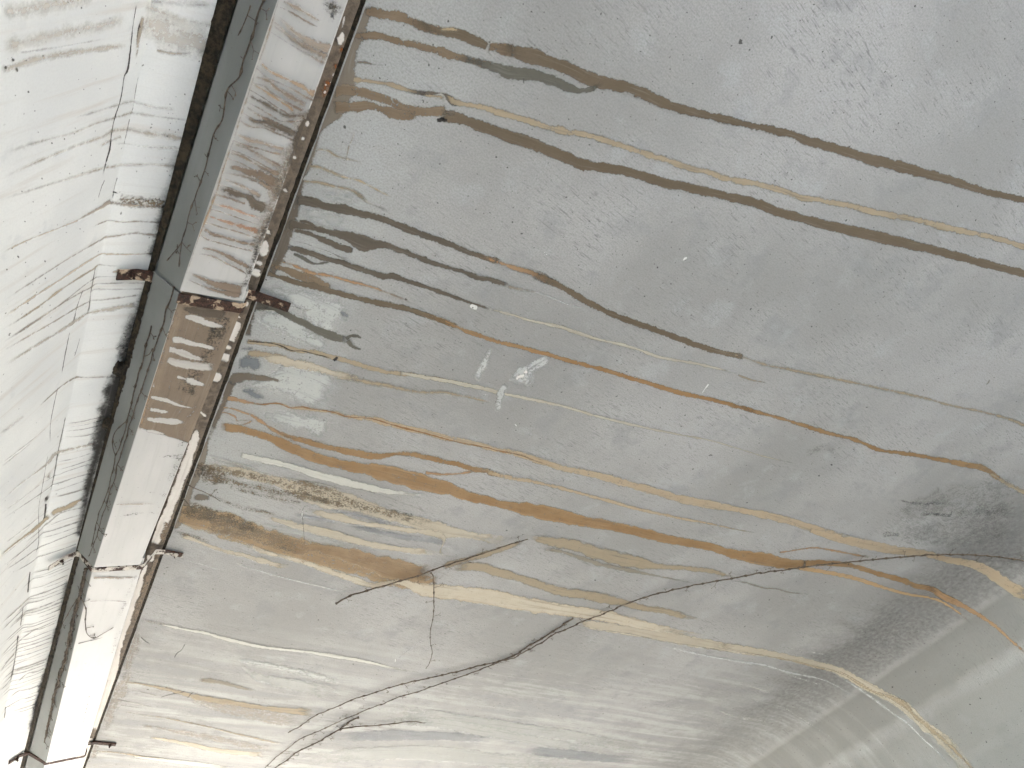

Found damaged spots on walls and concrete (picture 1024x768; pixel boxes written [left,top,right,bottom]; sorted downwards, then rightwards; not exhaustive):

water stain [12,191,164,263]
water stain [268,8,724,371]
peeling [221,302,249,362]
peeling [152,430,200,544]
water stain [154,302,972,768]
water stain [92,715,275,768]